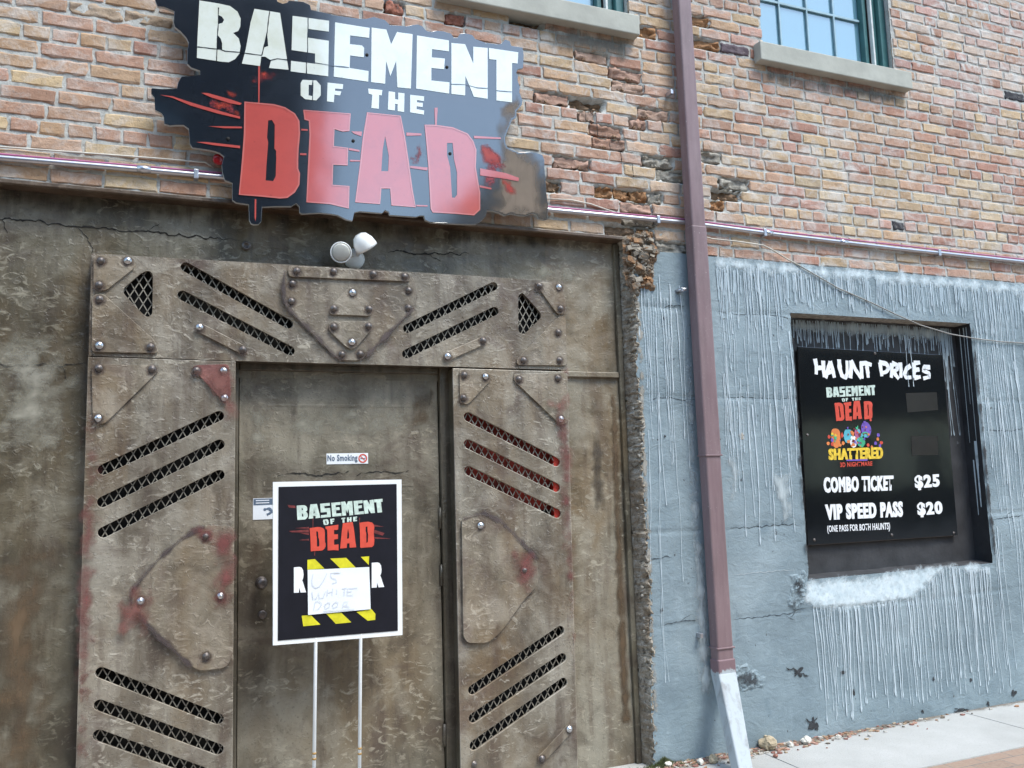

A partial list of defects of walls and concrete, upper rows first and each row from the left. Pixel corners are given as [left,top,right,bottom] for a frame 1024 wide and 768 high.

spalling [533,92,668,152]
spalling [546,182,560,193]
spalling [552,157,589,172]
spalling [641,156,683,184]
crack [0,217,240,254]
crack [388,250,469,261]
spalling [594,187,686,766]
water stain [637,274,690,683]
water stain [716,265,1024,724]
spalling [787,570,807,611]